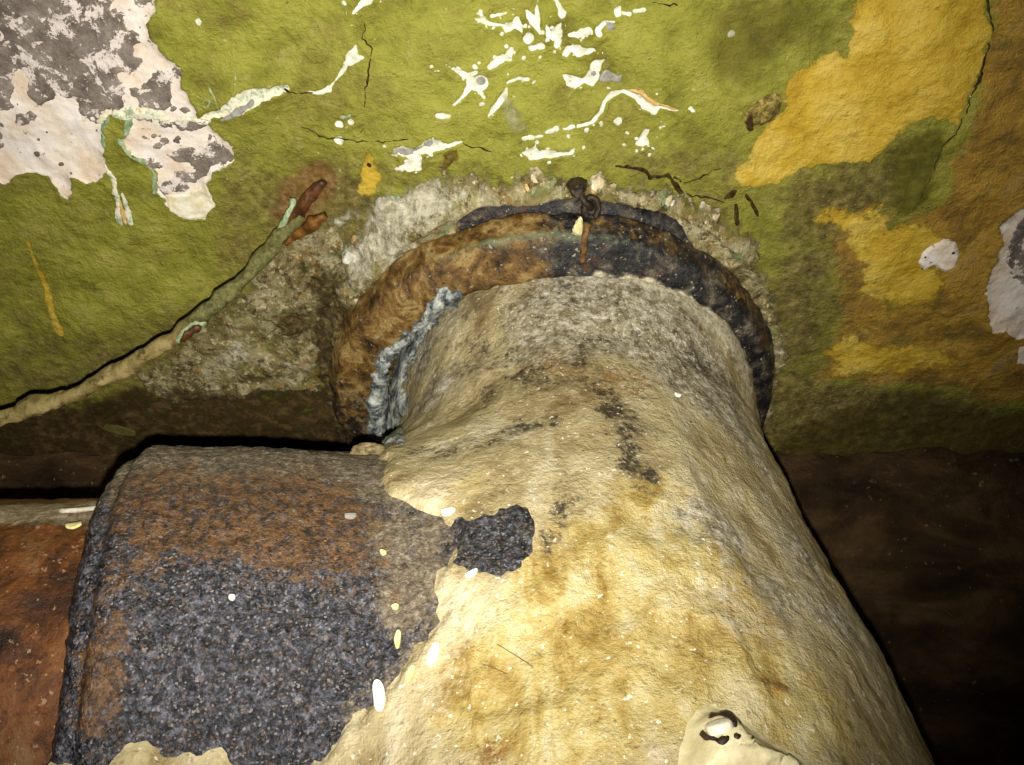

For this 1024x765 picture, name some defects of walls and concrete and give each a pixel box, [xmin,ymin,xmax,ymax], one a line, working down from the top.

peeling [341,0,381,26]
peeling [0,0,235,226]
crack [200,22,408,144]
peeling [430,0,695,164]
crack [912,0,994,211]
corrosion [273,164,335,220]
peeling [383,138,462,174]
crack [615,165,759,226]
spalling [918,238,959,272]
peeling [984,209,1024,365]
peeling [441,504,535,578]
peeling [699,711,741,745]